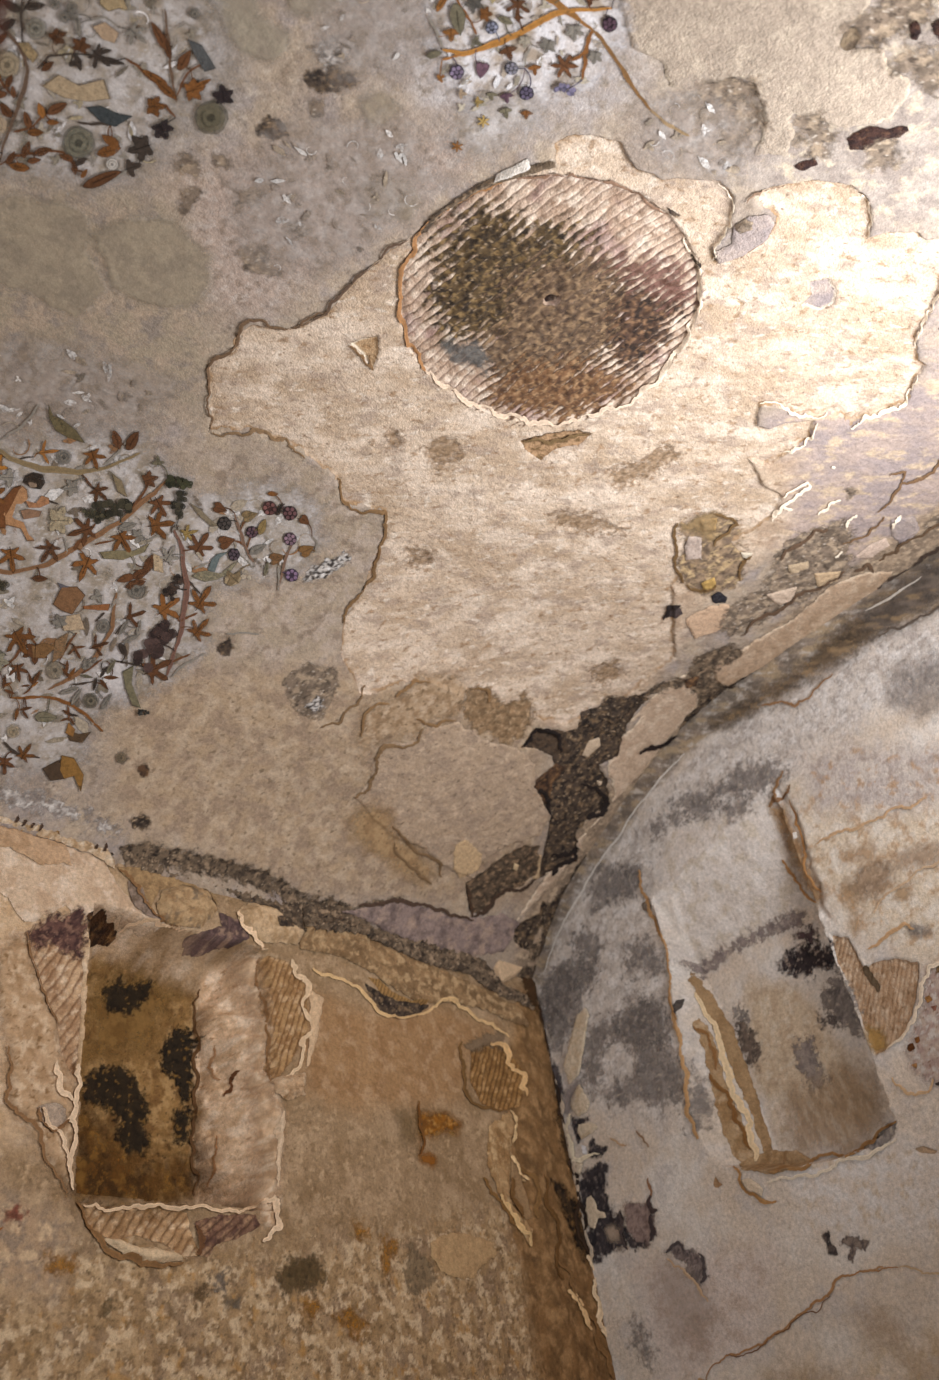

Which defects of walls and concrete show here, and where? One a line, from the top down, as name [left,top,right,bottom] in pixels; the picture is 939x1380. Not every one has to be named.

water stain [910,20,939,40]
spalling [206,77,939,917]
crack [843,463,939,589]
crack [640,672,753,754]
water stain [715,577,939,729]
spalling [514,902,547,962]
crack [540,855,587,952]
spalling [0,906,324,1269]
water stain [520,753,712,1302]
flaking render [458,1030,565,1280]
water stain [822,1231,869,1263]
crack [698,1265,939,1380]